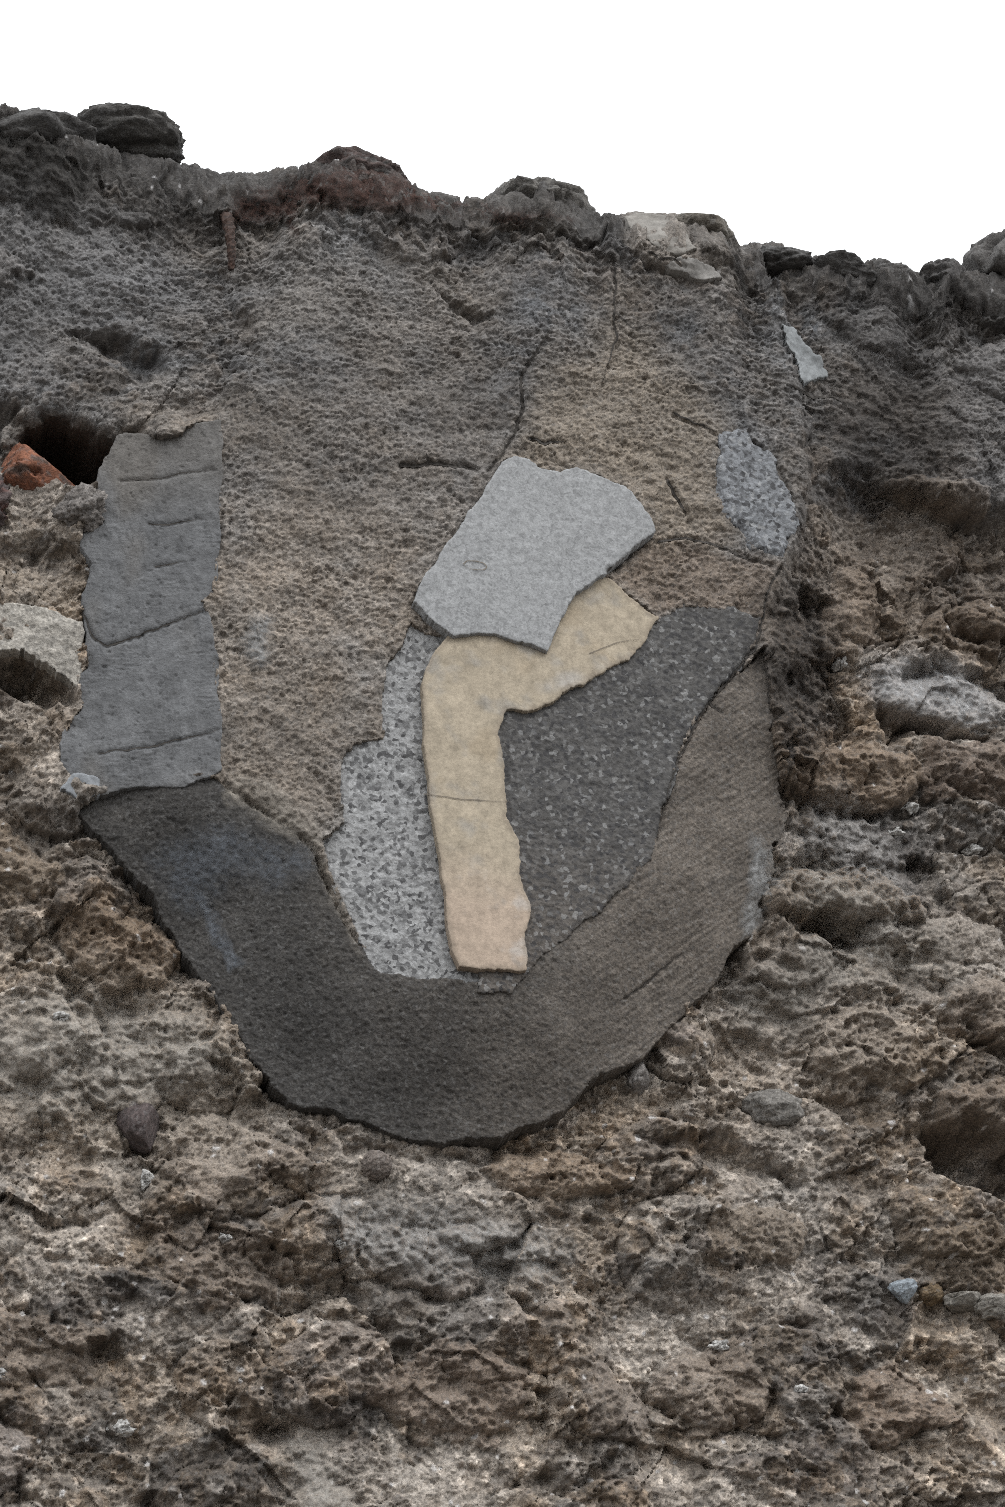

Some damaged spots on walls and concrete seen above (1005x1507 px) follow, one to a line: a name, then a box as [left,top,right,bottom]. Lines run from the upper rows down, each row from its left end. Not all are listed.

crack [400,332,564,471]